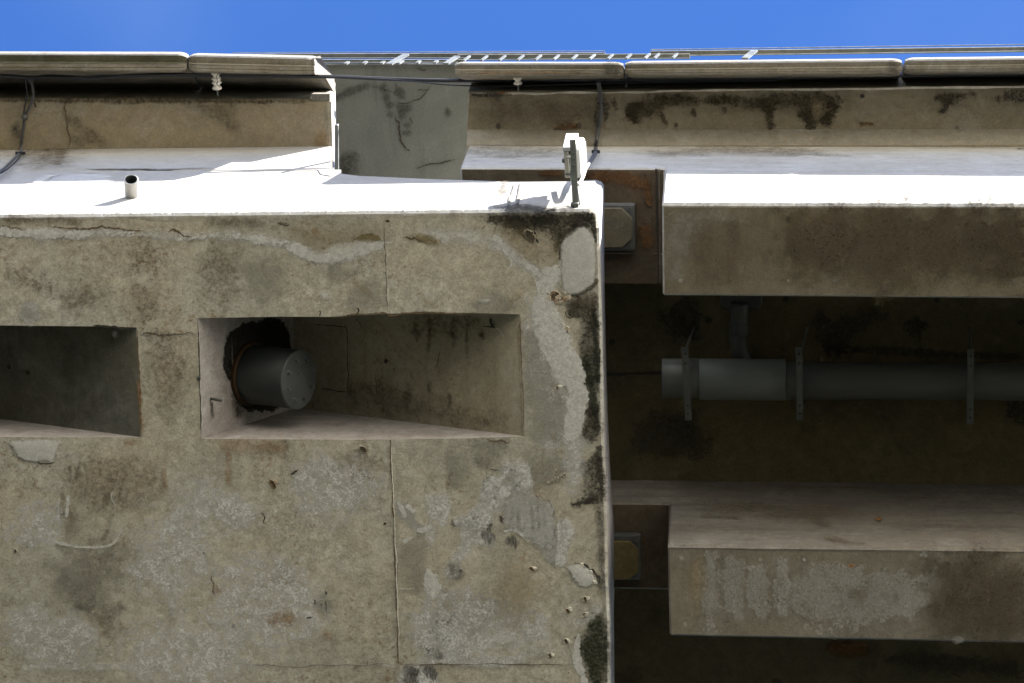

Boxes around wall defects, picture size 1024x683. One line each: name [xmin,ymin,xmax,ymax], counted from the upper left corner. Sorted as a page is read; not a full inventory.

leakage [594,91,843,130]
leakage [935,92,976,112]
leakage [0,181,598,280]
spalling [521,229,539,244]
leakage [522,296,606,504]
peeling [531,227,611,683]